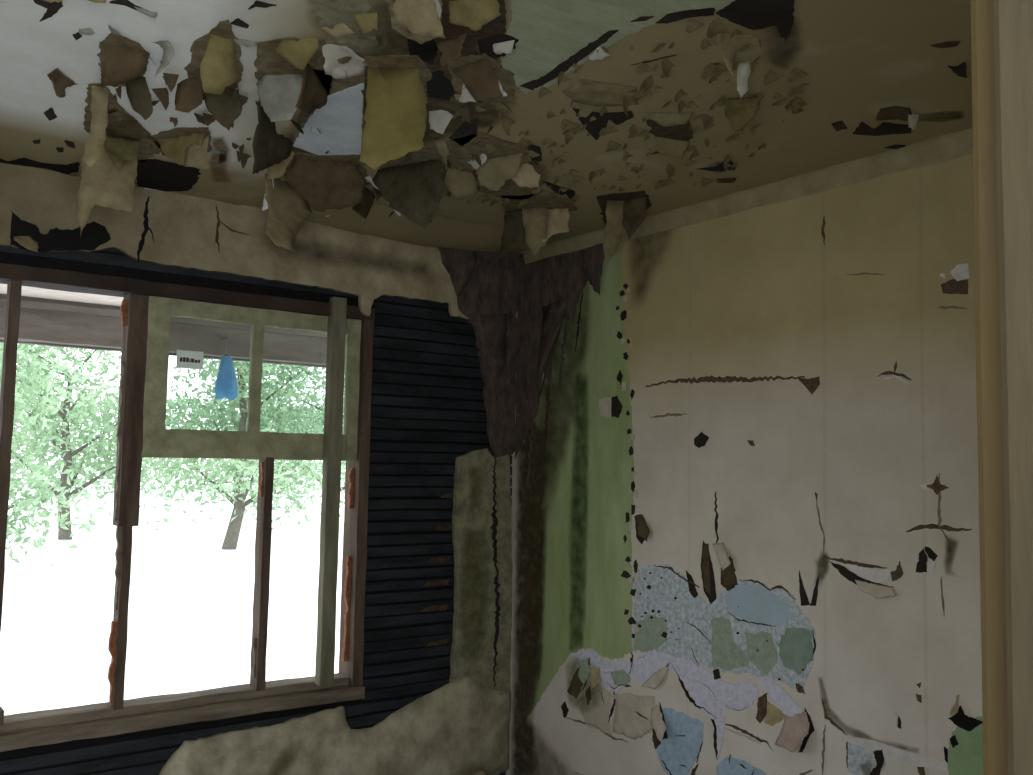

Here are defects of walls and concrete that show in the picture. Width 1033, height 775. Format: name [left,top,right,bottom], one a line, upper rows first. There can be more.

flaking render [0,0,810,298]
crack [137,196,154,263]
crack [215,205,250,253]
peeling [611,283,650,544]
crack [646,375,820,394]
flaking render [0,295,494,775]
water stain [490,458,501,687]
water stain [513,308,587,775]
peeling [686,541,738,604]
crack [712,492,720,543]
peeling [799,557,827,606]
crack [906,473,972,539]